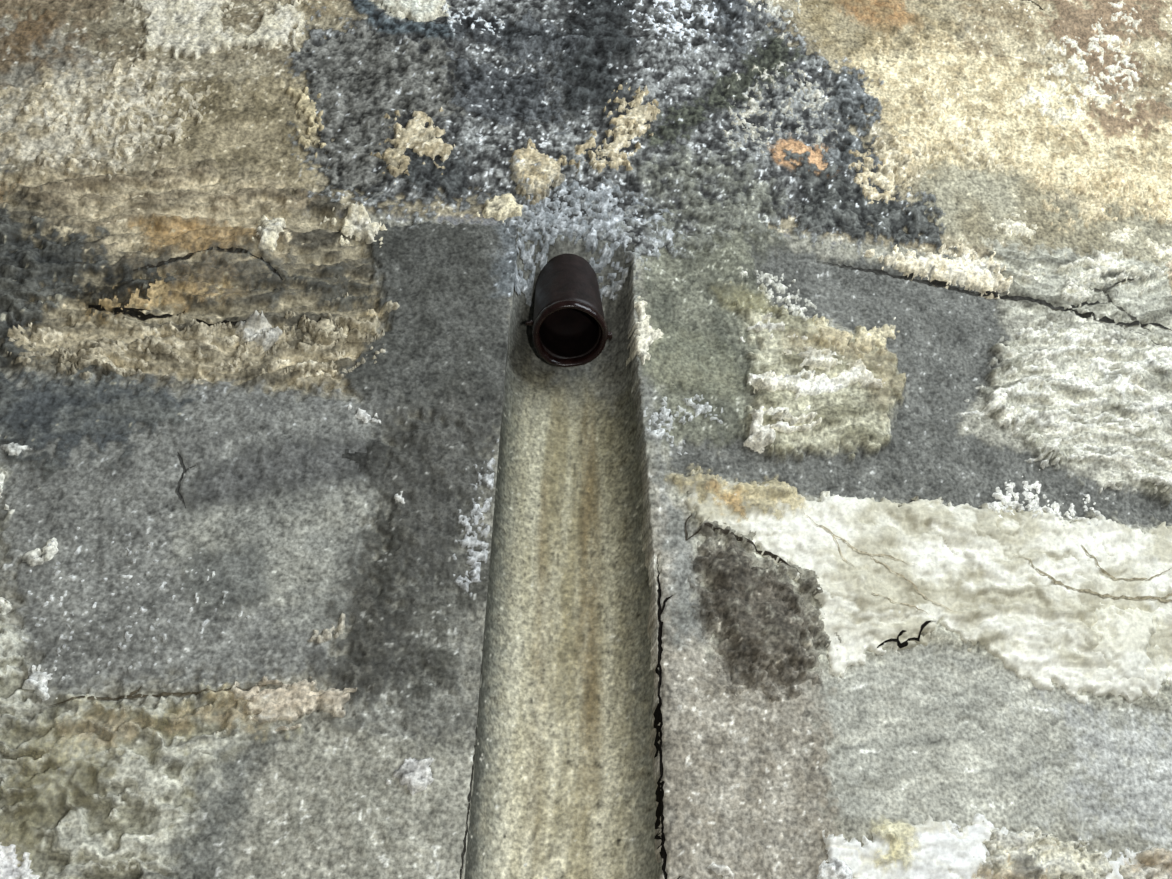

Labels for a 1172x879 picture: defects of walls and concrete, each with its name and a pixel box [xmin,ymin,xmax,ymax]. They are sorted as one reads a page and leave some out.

water stain [284,0,957,307]
crack [88,305,246,326]
crack [133,246,283,280]
water stain [739,267,818,322]
crack [817,261,1172,347]
crack [803,511,963,648]
crack [653,558,681,879]